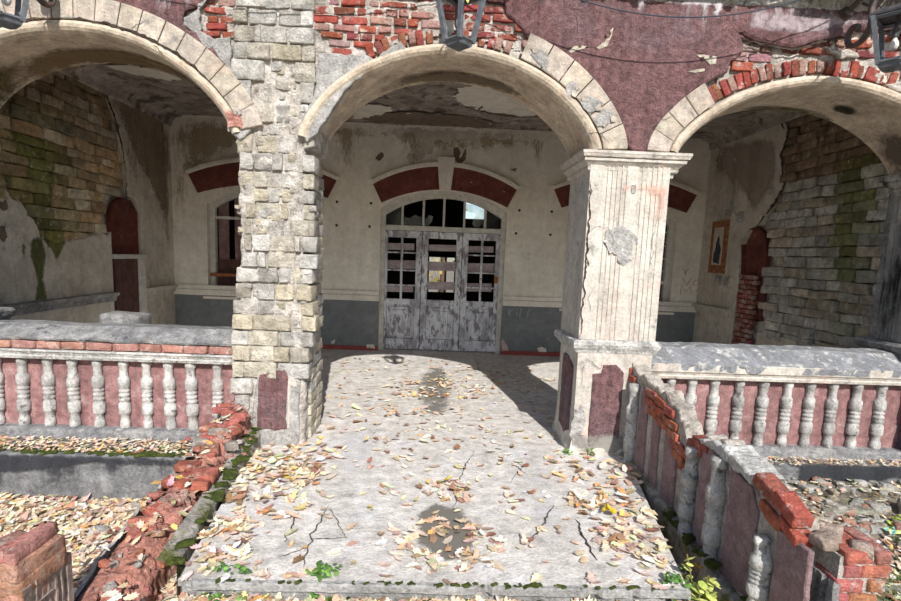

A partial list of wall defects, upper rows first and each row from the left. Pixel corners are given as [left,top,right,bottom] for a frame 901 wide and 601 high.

flaking render [108,64,182,82]
flaking render [202,0,235,39]
flaking render [314,0,549,72]
flaking render [730,32,901,72]
flaking render [352,86,536,129]
crack [755,122,789,230]
flaking render [604,226,638,266]
crack [276,505,347,565]